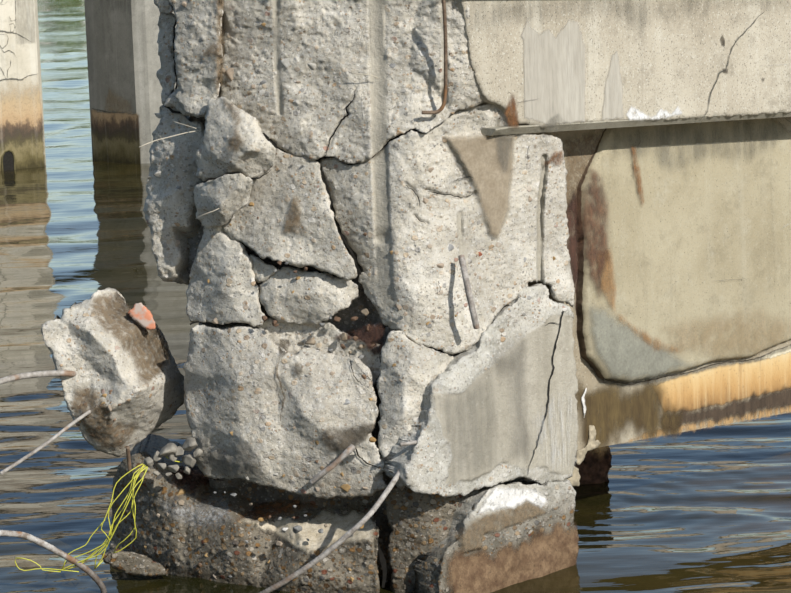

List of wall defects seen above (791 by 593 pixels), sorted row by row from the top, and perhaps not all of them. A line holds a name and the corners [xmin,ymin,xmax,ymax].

spalling [422,0,448,114]
damp [0,88,46,171]
crack [242,91,419,279]
rust [567,172,615,306]
crack [190,280,269,327]
rust [337,324,384,355]
spalling [458,255,480,329]
crack [349,353,381,440]
crack [528,311,564,472]
damp [656,352,791,433]
spalling [310,444,356,484]
spalling [259,468,400,593]